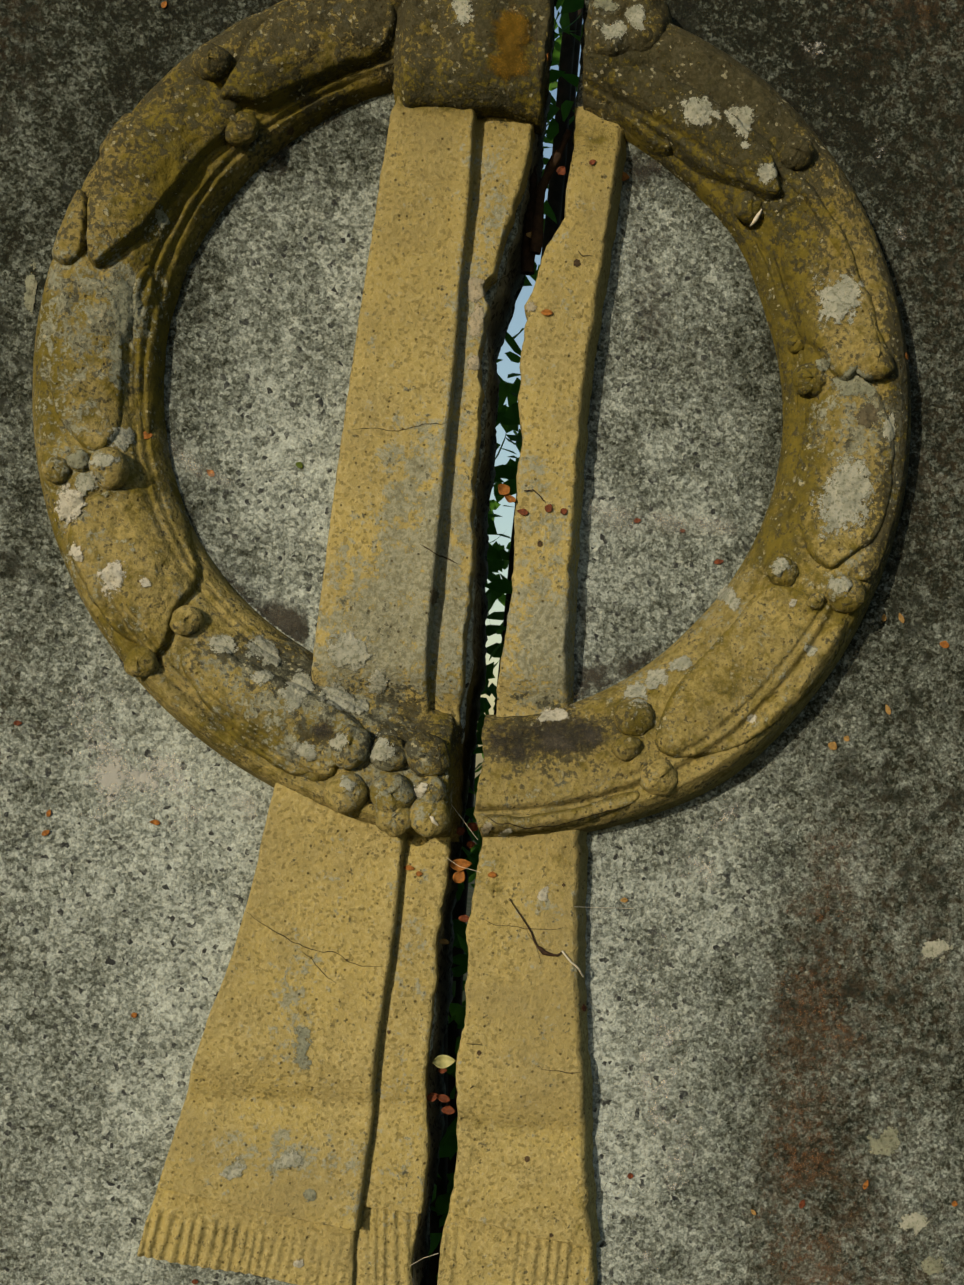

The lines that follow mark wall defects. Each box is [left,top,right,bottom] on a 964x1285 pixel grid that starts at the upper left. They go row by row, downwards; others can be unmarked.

crack [355,423,444,431]
crack [413,0,631,1285]
corrosion [758,826,881,1285]